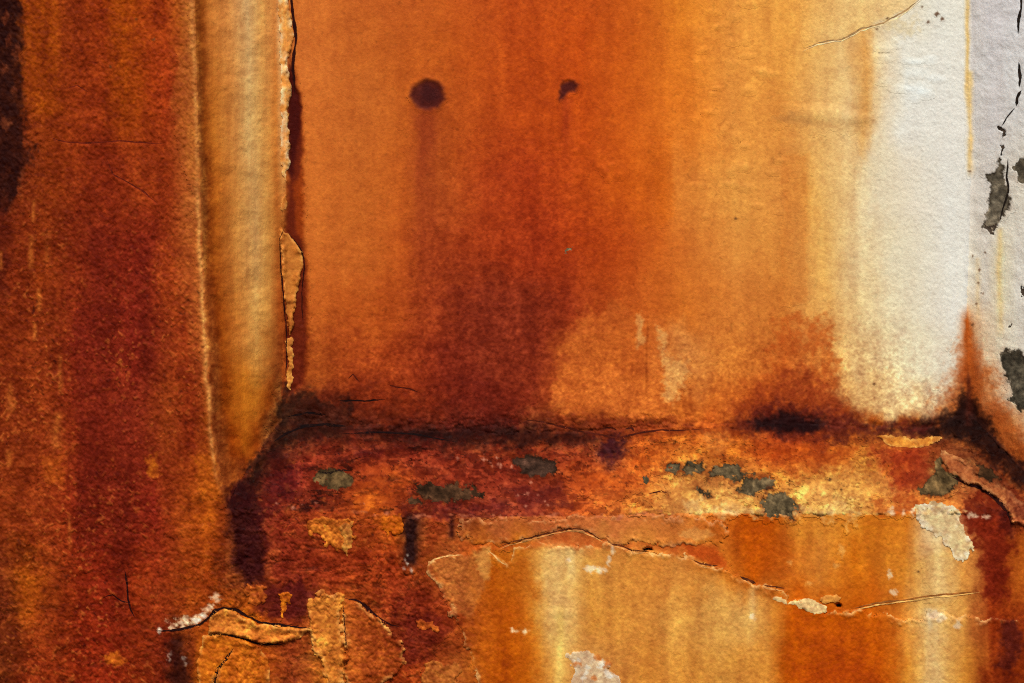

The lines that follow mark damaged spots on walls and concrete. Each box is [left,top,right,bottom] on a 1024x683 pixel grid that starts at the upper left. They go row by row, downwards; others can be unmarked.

peeling [278,0,294,179]
crack [804,1,920,50]
spalling [977,126,1024,235]
rust [0,0,207,683]
crack [275,374,455,442]
rust [186,44,936,676]
crack [517,420,707,439]
leakage [729,391,940,452]
rust [917,303,1024,493]
peeling [306,435,1024,683]
rust [959,489,1024,622]
peeling [155,583,407,683]